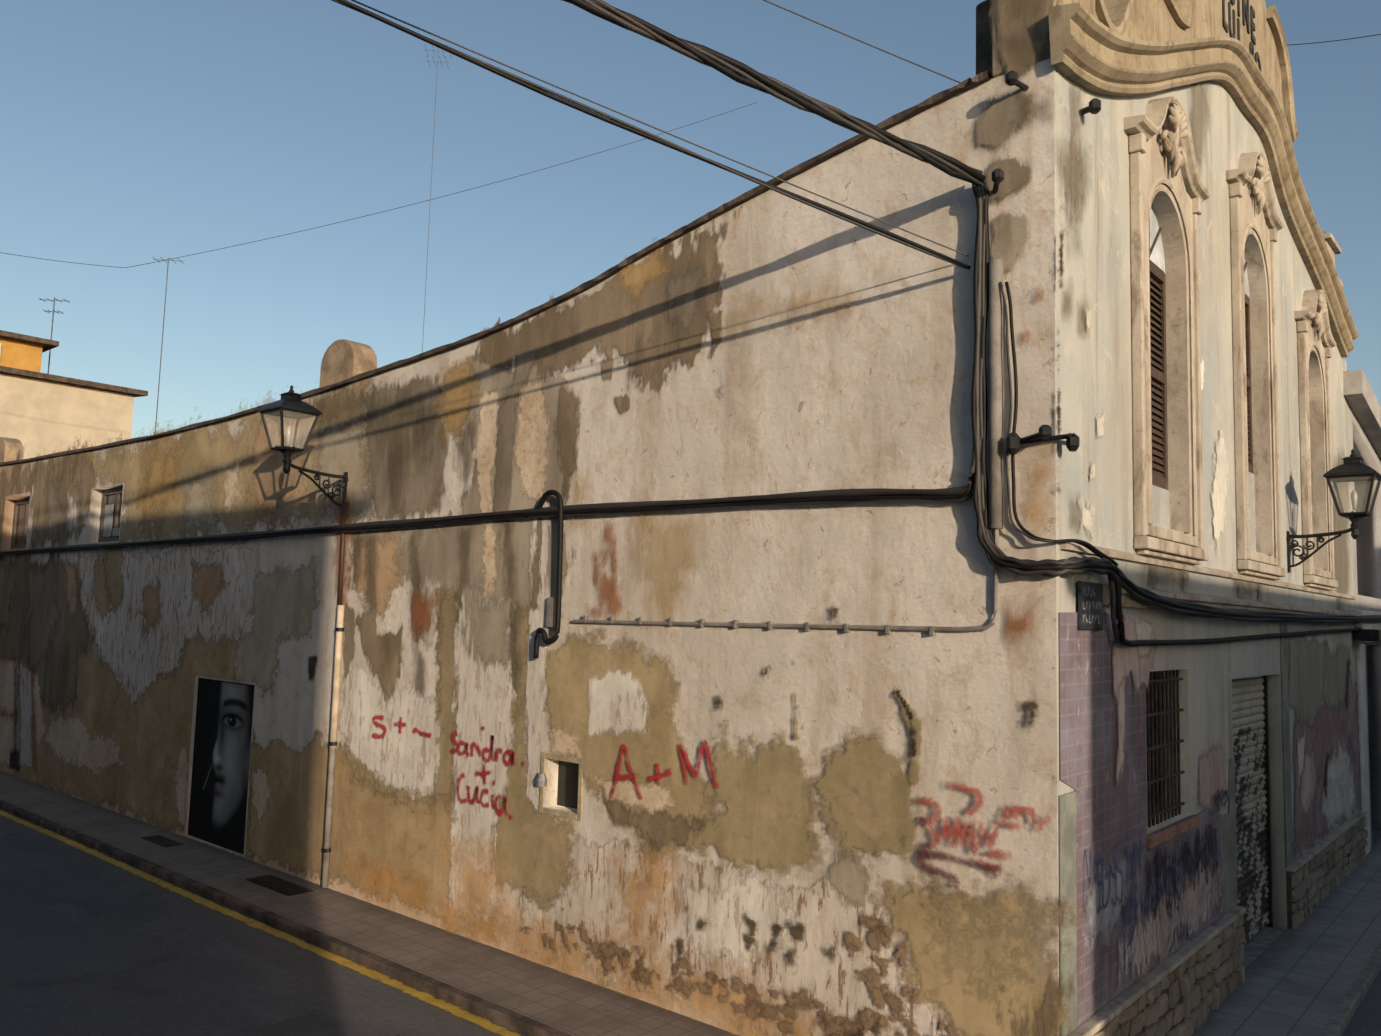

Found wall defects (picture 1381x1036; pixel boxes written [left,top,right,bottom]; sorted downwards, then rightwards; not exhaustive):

flaking render [475,212,736,414]
damp [0,451,94,771]
flaking render [33,368,382,706]
flaking render [248,587,462,921]
rust [593,526,621,615]
peeling [518,628,958,1036]
peeling [1113,613,1155,784]
peeling [1211,431,1229,551]
peeling [1297,733,1357,829]